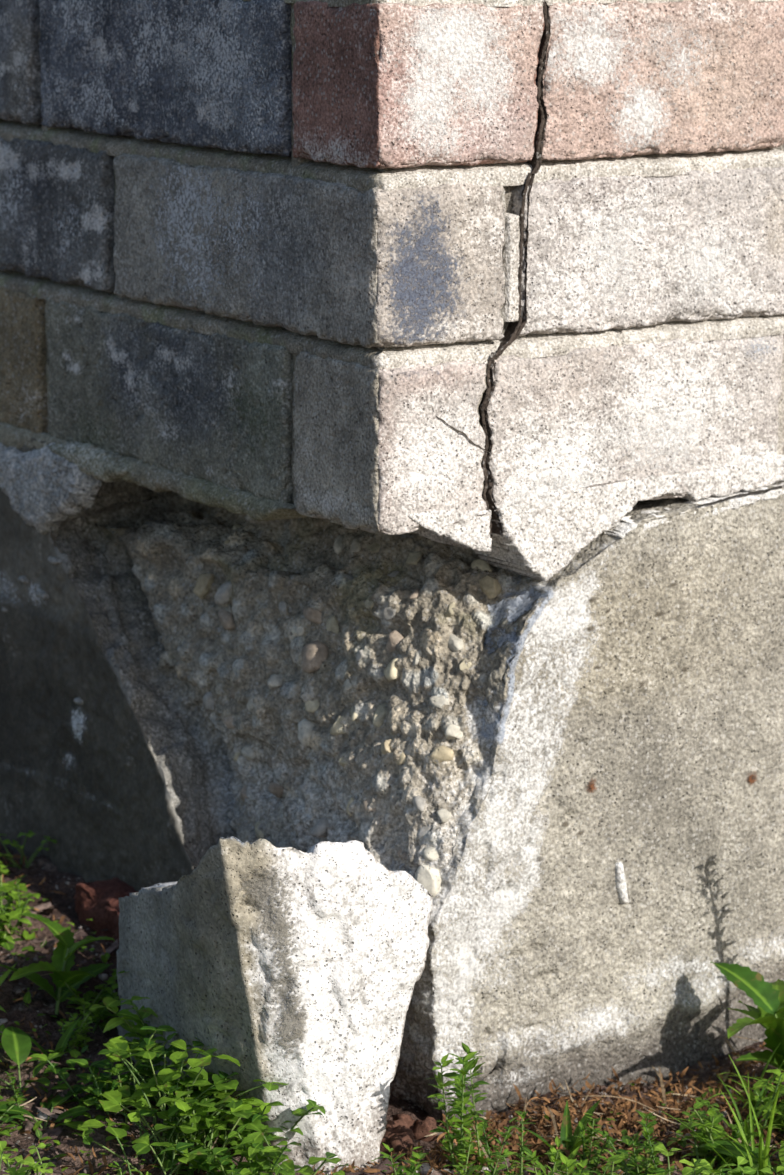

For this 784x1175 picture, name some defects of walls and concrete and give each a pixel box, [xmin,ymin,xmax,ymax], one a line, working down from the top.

crack [436,0,551,537]
crack [579,479,629,490]
spalling [48,479,702,1125]
peeling [3,902,57,949]
peeling [24,1060,79,1175]
peeling [345,1159,397,1175]
peeling [430,1133,538,1175]
peeling [626,1125,729,1175]